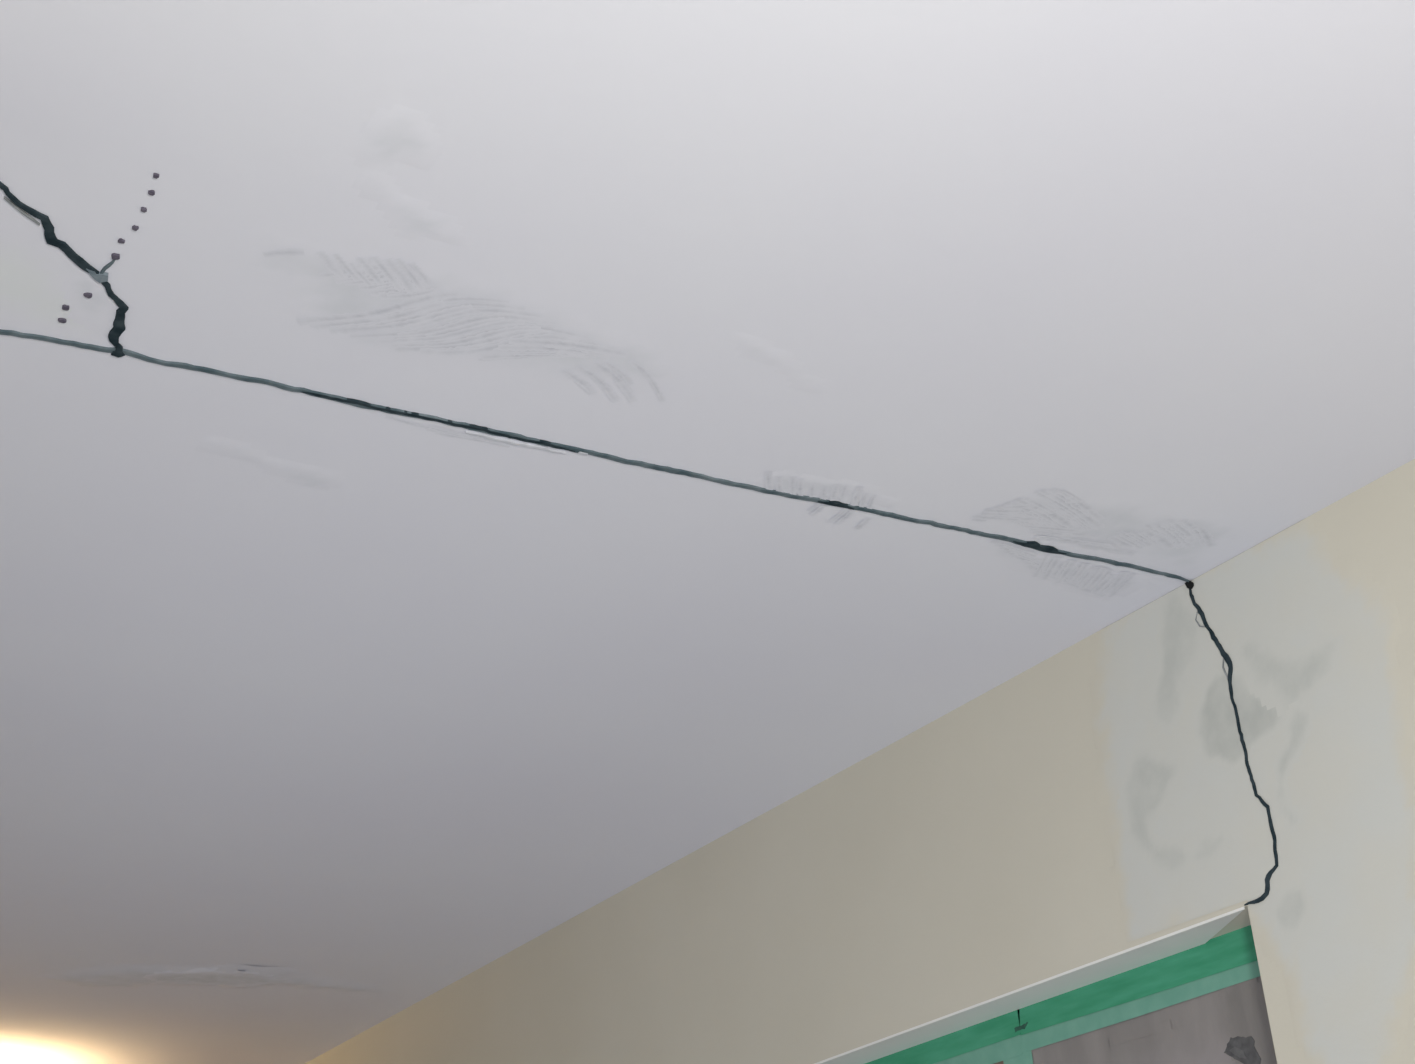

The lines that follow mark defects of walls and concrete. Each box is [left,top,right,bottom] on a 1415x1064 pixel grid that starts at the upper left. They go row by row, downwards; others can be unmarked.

crack [0,181,1278,906]